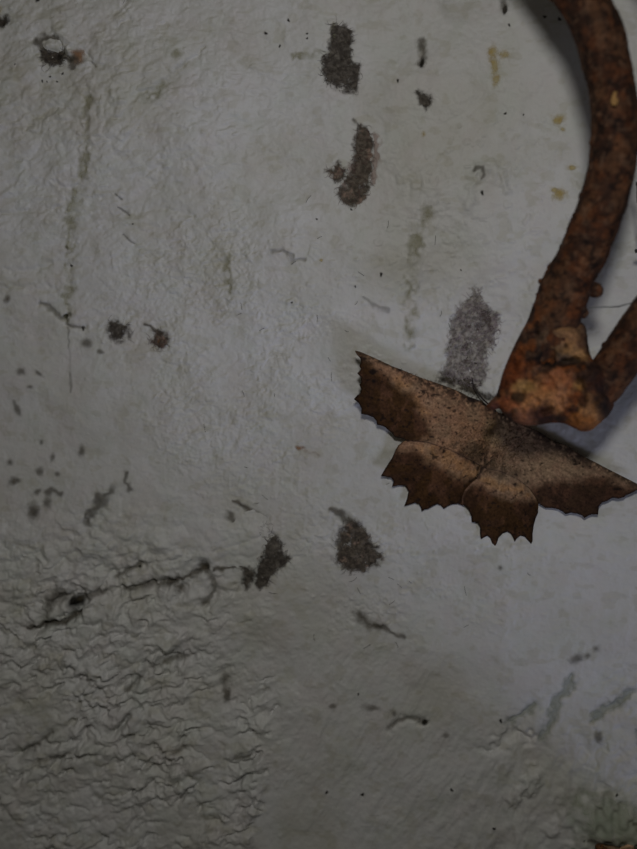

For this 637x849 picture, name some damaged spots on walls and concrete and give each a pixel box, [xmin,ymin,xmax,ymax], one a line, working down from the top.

crack [168,563,209,584]
crack [26,610,82,630]